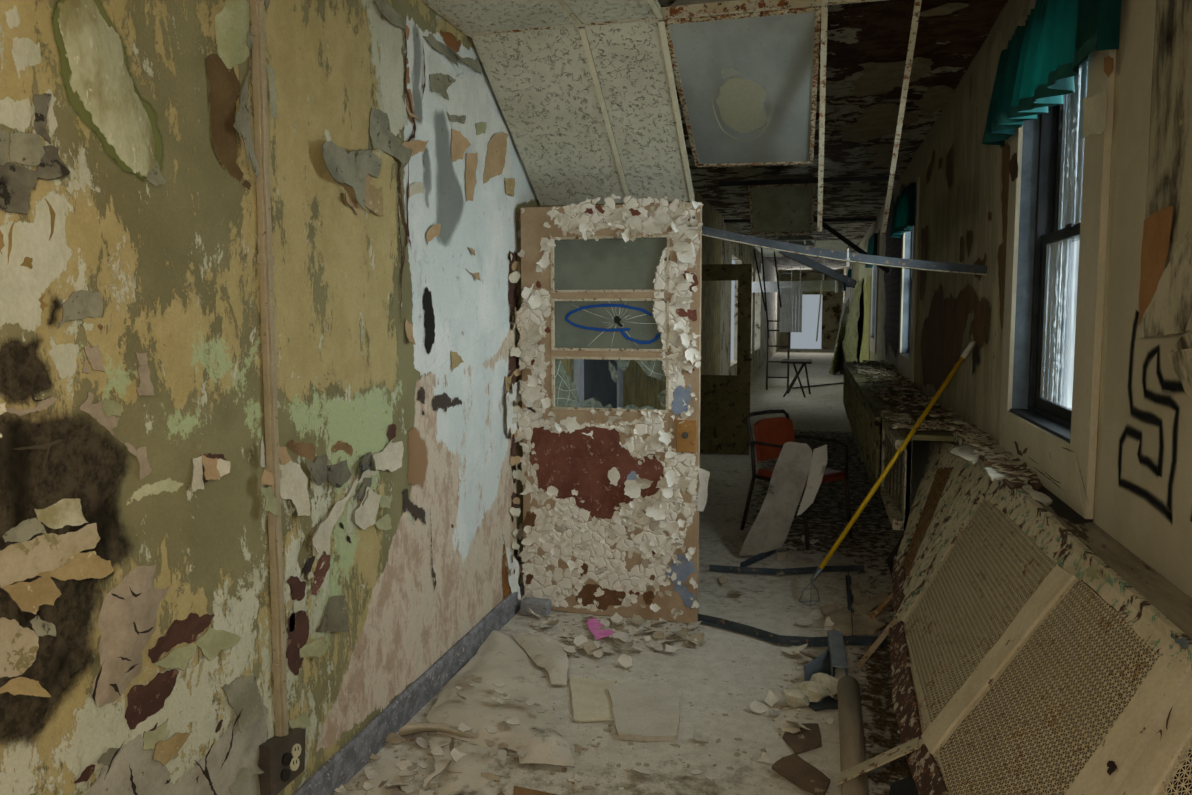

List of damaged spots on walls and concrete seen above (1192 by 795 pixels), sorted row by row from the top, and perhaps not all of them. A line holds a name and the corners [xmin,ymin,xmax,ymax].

peeling [429,49,515,202]
peeling [0,191,74,332]
damp [48,297,61,325]
spalling [857,184,905,362]
peeling [920,143,1018,392]
peeling [0,498,114,698]
damp [0,338,132,744]
peeling [126,453,231,505]
peeling [125,613,241,766]
peeling [260,433,357,516]
peeling [286,551,331,676]
peeling [502,194,710,620]